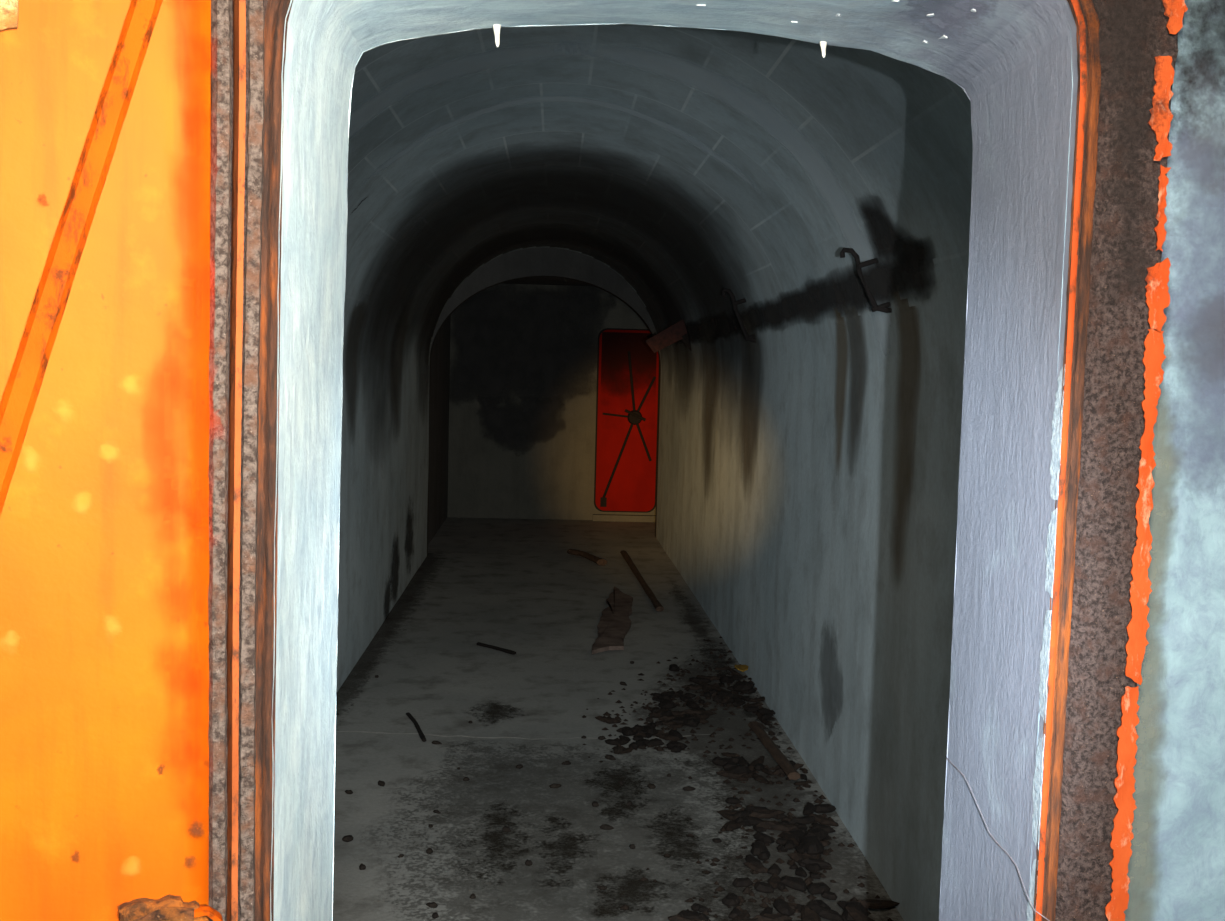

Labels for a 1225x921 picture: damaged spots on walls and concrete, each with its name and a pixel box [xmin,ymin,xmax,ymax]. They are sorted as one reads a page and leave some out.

peeling [1162,0,1188,35]
leakage [449,284,614,451]
leakage [701,322,717,472]
leakage [743,321,760,475]
peeling [1105,56,1175,921]
leakage [384,506,414,619]
leakage [470,702,524,723]
leakage [586,766,650,820]
leakage [459,804,592,886]
leakage [648,809,704,867]
leakage [594,868,669,917]